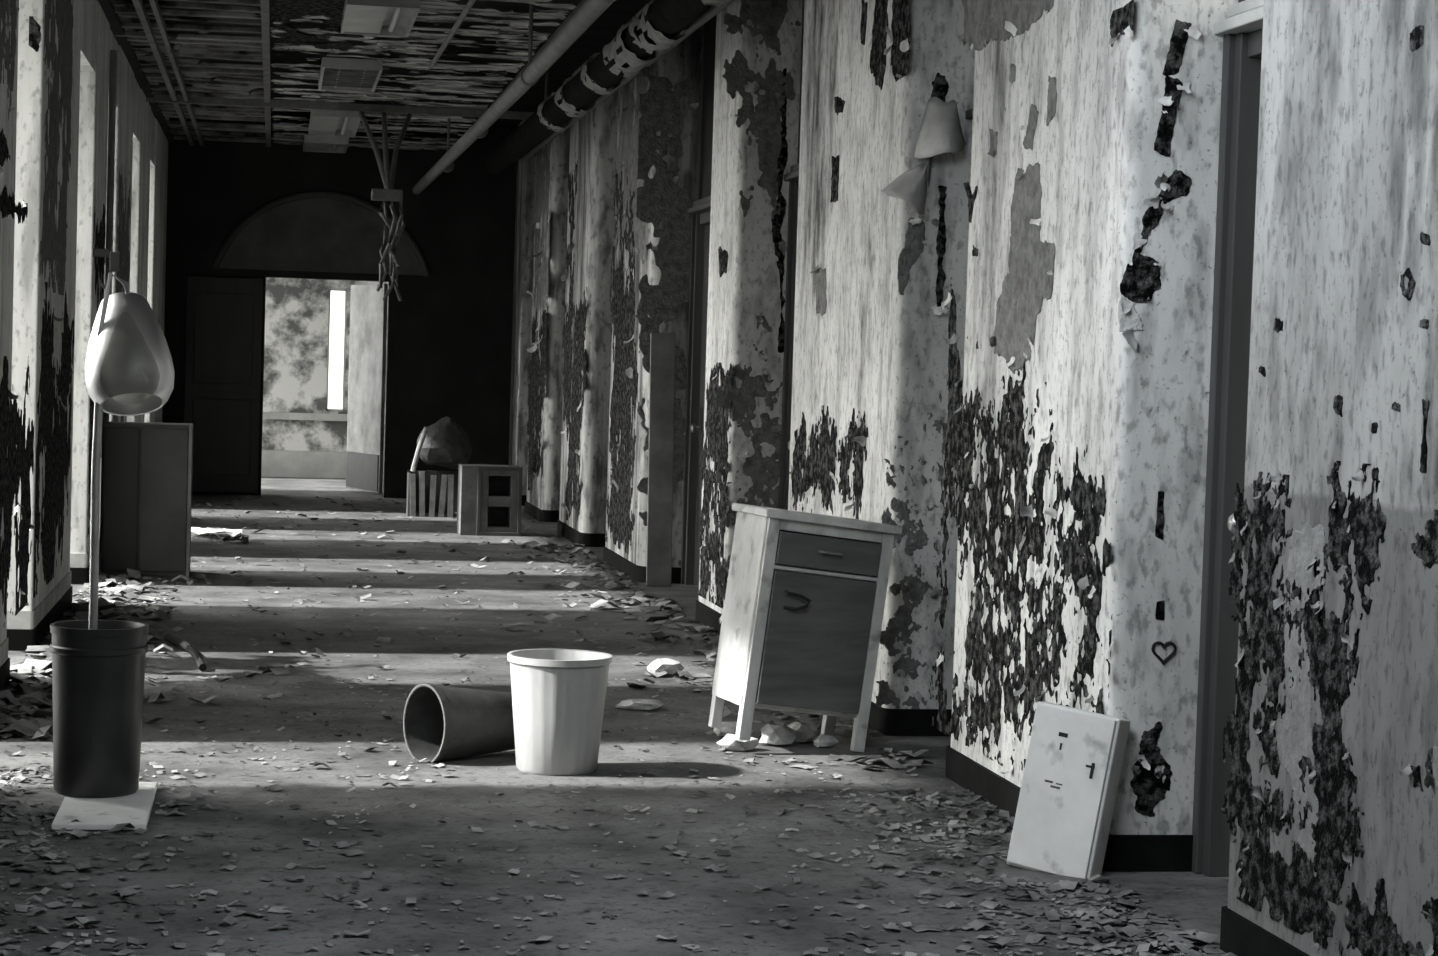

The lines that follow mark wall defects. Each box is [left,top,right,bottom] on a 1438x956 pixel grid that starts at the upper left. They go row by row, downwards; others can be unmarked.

peeling [0,0,74,625]
peeling [93,165,131,321]
peeling [525,144,588,521]
peeling [604,66,699,554]
peeling [722,0,801,265]
peeling [673,316,869,625]
peeling [869,0,911,90]
peeling [875,72,1117,774]
peeling [960,0,1054,51]
flaking render [1118,20,1201,350]
peeling [1130,721,1172,817]
peeling [1221,461,1438,956]